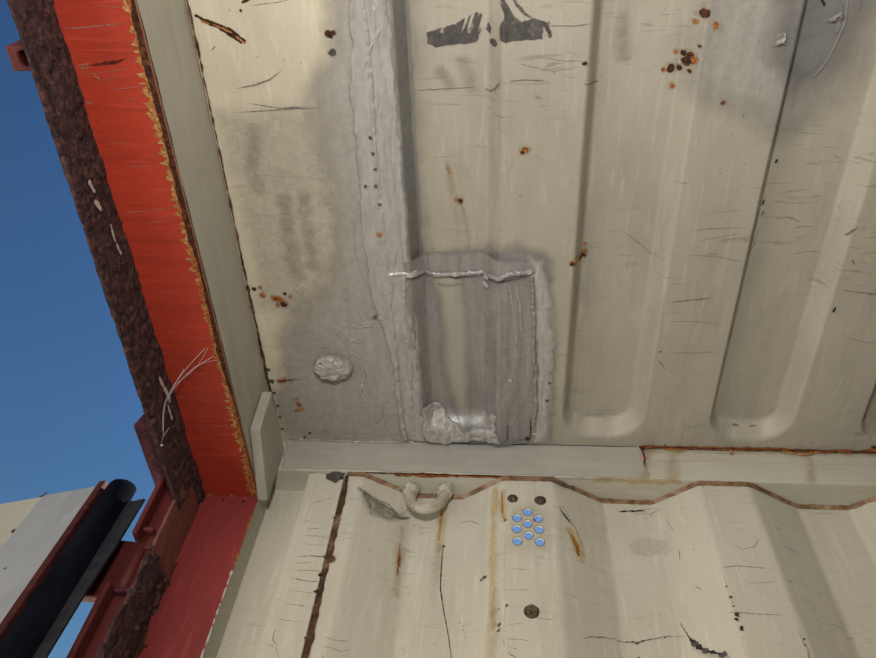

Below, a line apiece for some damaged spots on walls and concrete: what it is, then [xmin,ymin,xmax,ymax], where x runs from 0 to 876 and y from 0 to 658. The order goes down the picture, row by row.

peeling [426,0,552,47]
rust [692,8,719,29]
rust [661,45,702,88]
damp [250,104,313,112]
rust [186,0,299,430]
rust [122,0,257,503]
rust [639,444,876,456]
rust [557,506,584,560]
rust [301,475,349,658]
crack [440,545,451,654]
crack [587,623,730,658]